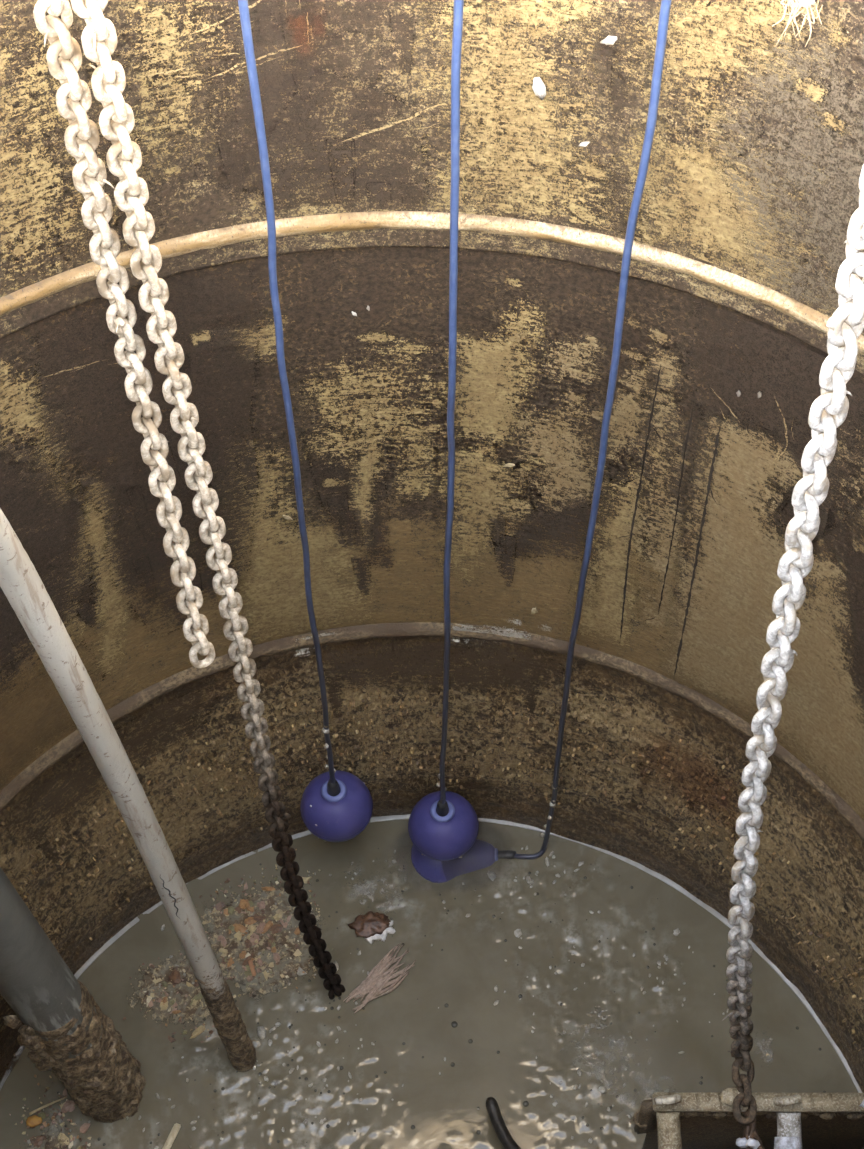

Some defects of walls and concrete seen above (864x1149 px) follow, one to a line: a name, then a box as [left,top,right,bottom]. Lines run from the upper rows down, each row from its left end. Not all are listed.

leakage [301,425,394,595]
crack [616,364,721,676]